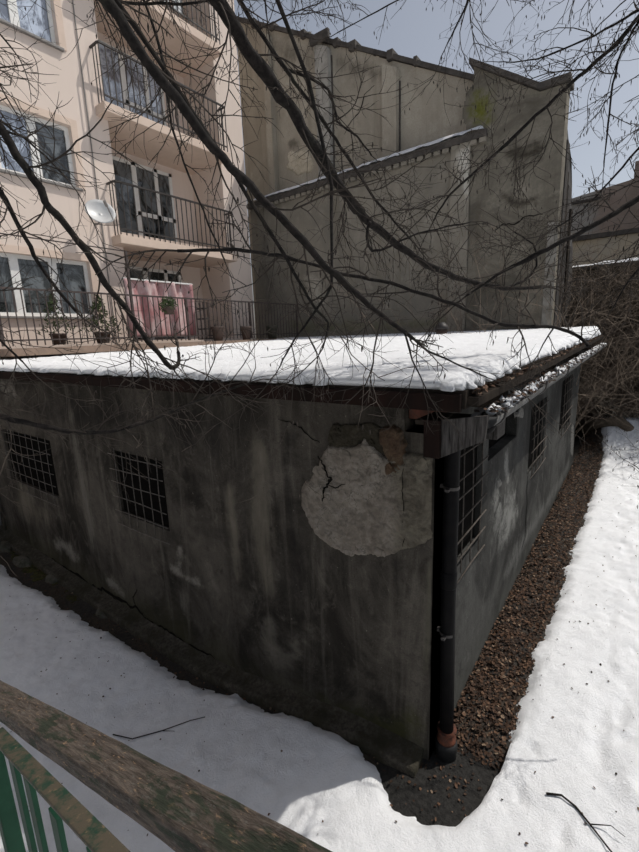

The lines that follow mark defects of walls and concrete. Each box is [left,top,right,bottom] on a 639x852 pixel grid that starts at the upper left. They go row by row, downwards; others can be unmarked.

spalling [301,422,433,557]